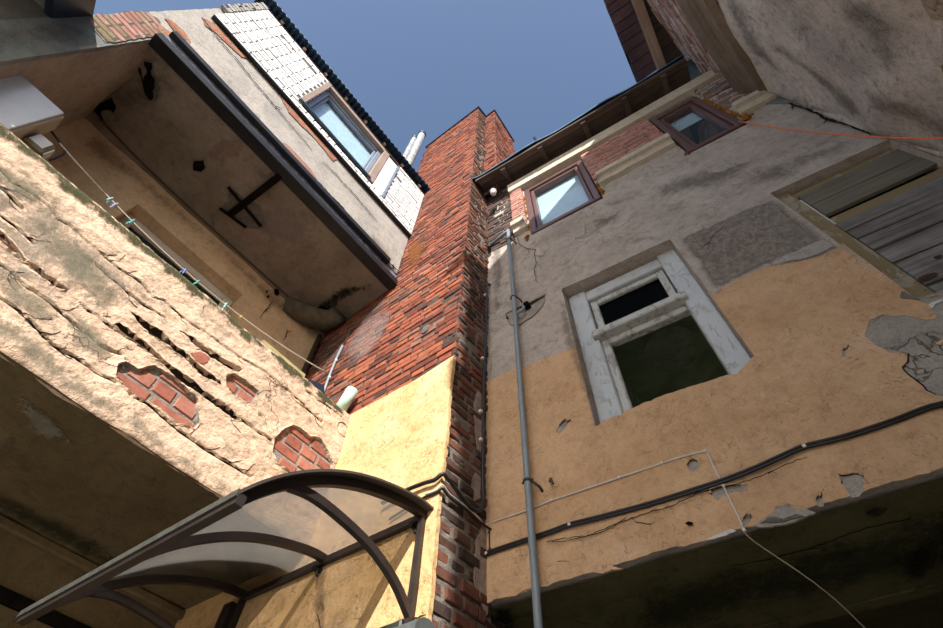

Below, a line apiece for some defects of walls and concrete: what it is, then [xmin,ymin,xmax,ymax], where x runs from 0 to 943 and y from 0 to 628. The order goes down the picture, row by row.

flaking render [88,11,191,44]
flaking render [201,17,248,60]
crack [788,103,871,135]
crack [0,170,218,342]
crack [0,265,120,380]
flaking render [112,309,259,431]
crack [238,359,337,428]
peeling [865,290,943,396]
crack [129,395,254,474]
flaking render [271,423,335,472]
flaking render [703,491,824,542]
peeling [837,471,864,498]